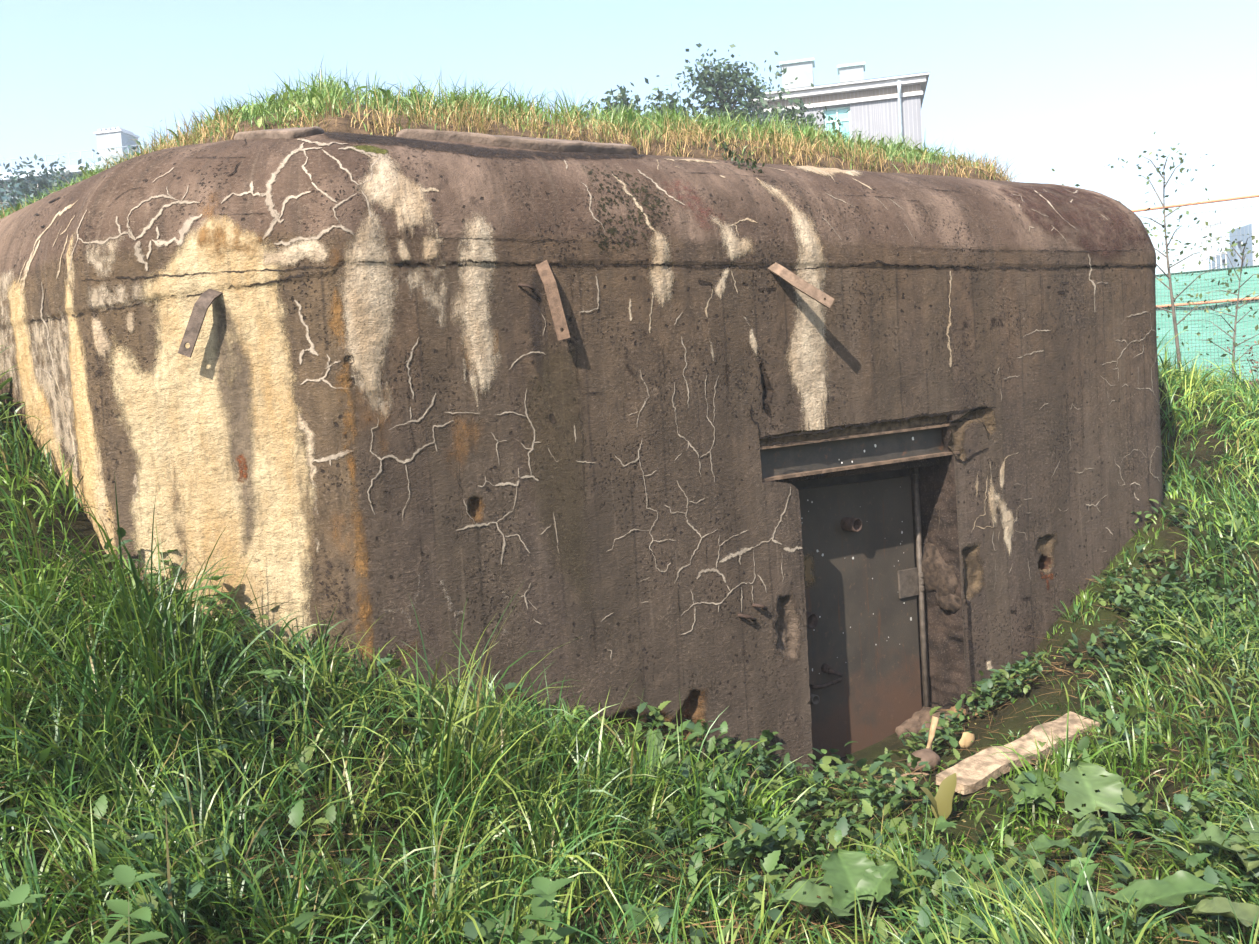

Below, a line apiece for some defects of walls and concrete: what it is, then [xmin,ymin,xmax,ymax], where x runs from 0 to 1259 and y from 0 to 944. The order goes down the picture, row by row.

crack [40,138,380,389]
damp [323,131,725,417]
crack [581,277,599,313]
damp [756,164,871,431]
damp [0,200,355,651]
corrosion [355,518,373,672]
spalling [468,497,484,523]
crack [312,313,802,635]
spalling [948,407,996,461]
damp [971,453,1017,571]
spalling [1036,535,1057,574]
spalling [605,689,705,747]